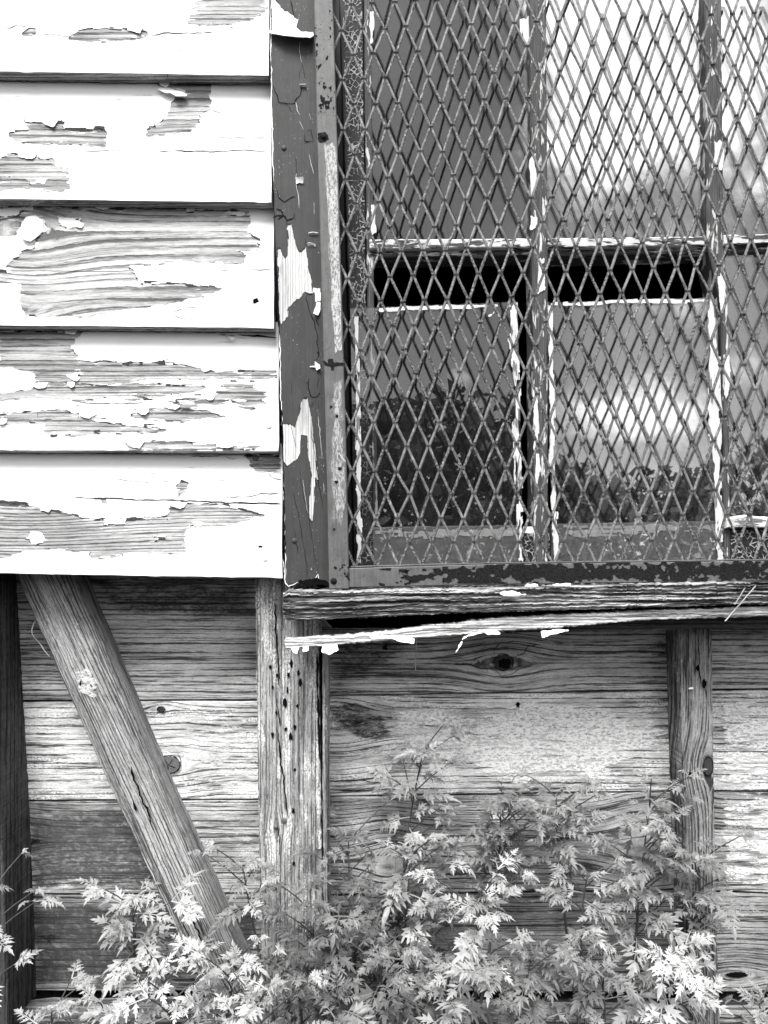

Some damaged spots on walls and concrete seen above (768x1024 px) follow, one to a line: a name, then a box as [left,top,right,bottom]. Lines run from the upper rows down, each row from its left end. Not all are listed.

peeling [68,26,148,42]
peeling [188,0,313,38]
peeling [146,82,212,137]
peeling [0,120,107,192]
peeling [0,206,318,521]
peeling [0,480,265,559]
crack [71,293,324,855]
peeling [369,635,415,644]
peeling [456,629,500,652]
peeling [541,629,569,638]